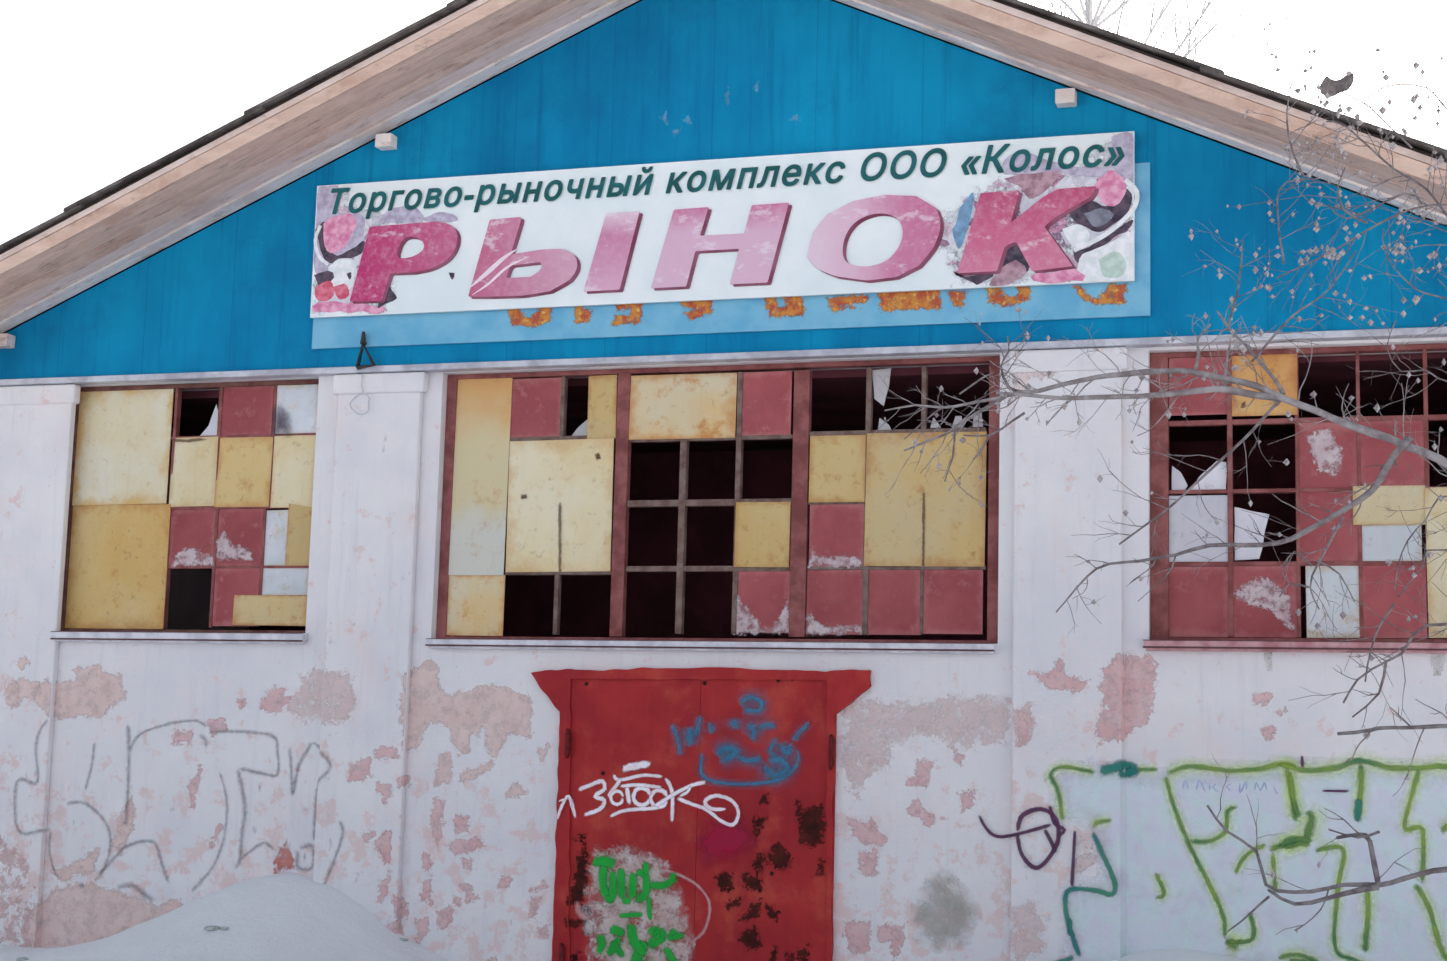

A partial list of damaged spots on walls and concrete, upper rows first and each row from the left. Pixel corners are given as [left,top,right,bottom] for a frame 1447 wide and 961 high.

peeling [5,656,126,720]
peeling [0,795,183,948]
peeling [273,841,294,874]
peeling [348,659,550,944]
corrosion [564,830,595,934]
corrosion [714,793,828,961]
peeling [848,818,888,877]
peeling [842,920,908,956]
peeling [905,759,944,827]
peeling [839,695,1035,795]
water stain [916,878,969,943]
peeling [1028,652,1158,748]